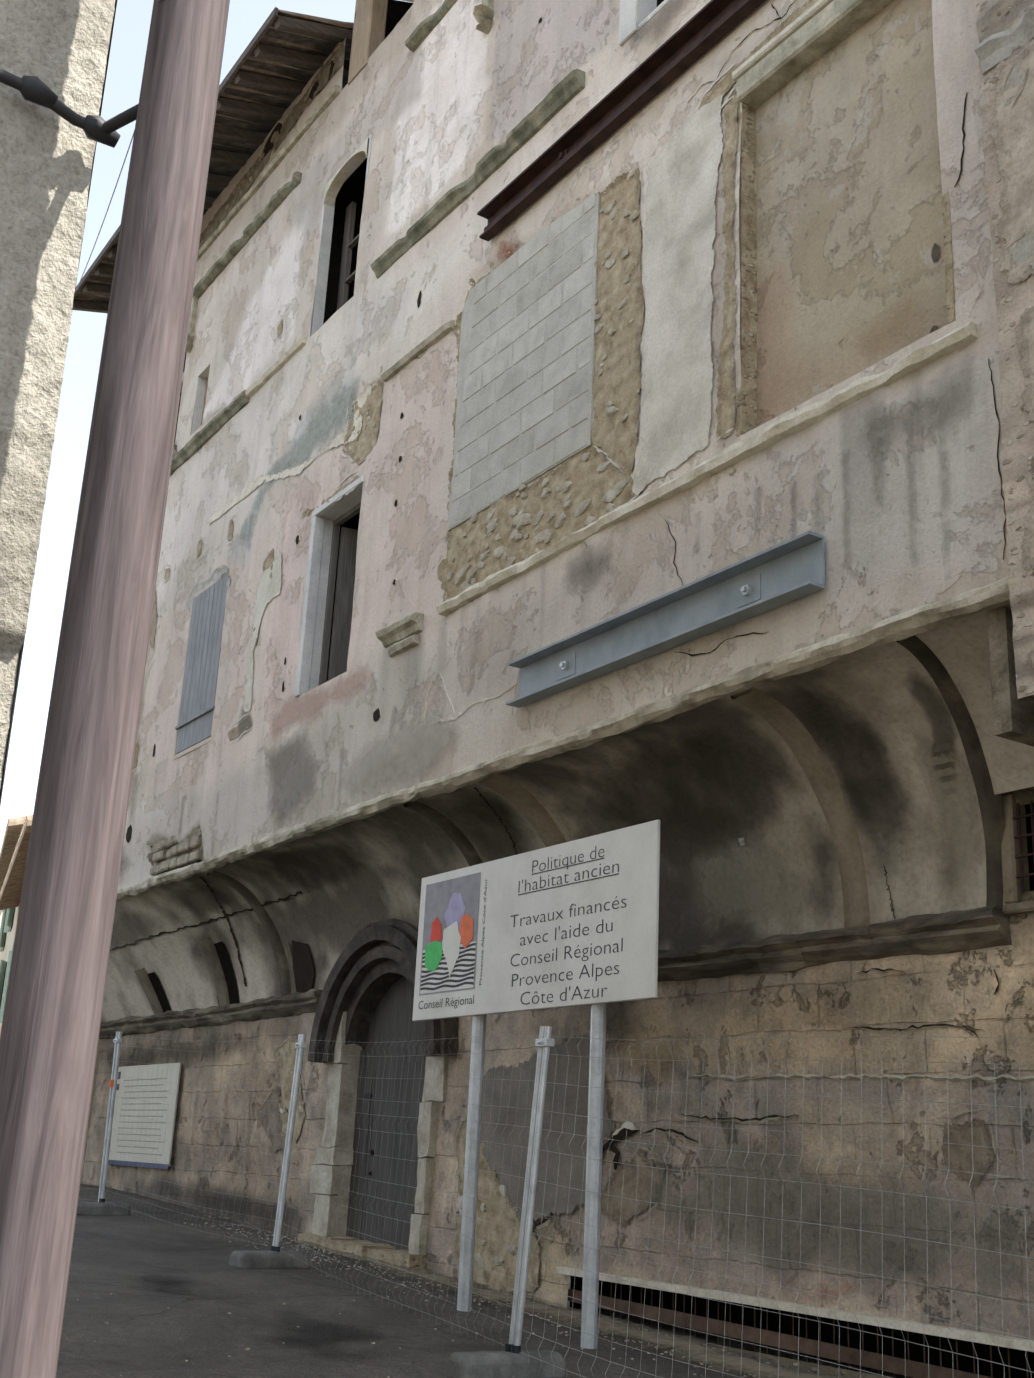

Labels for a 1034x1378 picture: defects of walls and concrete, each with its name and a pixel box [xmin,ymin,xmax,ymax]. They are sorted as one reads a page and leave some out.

crack [954,93,967,187]
spalling [437,0,818,612]
damp [920,748,976,858]
damp [698,847,783,916]
crack [110,876,303,986]
crack [853,1024,982,1037]
crack [680,1073,1034,1084]
peeling [454,1032,666,1293]
crack [602,1114,799,1170]